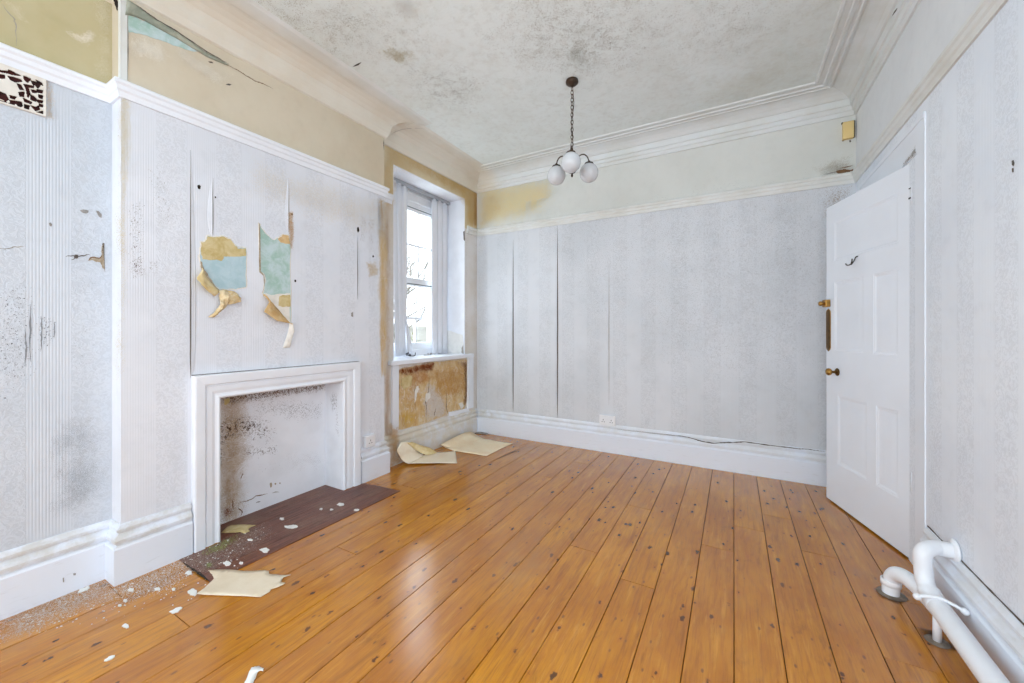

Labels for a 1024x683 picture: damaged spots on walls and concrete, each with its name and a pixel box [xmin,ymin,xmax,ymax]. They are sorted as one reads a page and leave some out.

spalling [89,243,105,270]
flaking render [200,236,246,261]
flaking render [263,280,296,322]
damp [240,146,852,465]
flaking render [399,330,469,430]
damp [220,384,339,524]
crack [620,429,825,452]